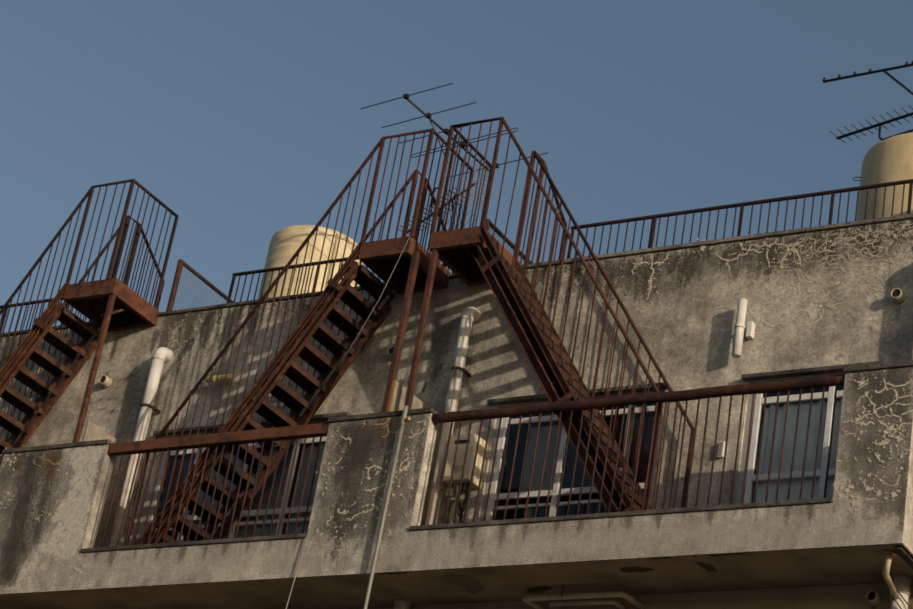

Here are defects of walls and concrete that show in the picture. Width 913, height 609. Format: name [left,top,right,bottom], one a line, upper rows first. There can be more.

crack [622,219,913,349]
crack [316,419,426,484]
crack [842,370,913,451]
damp [0,453,54,587]